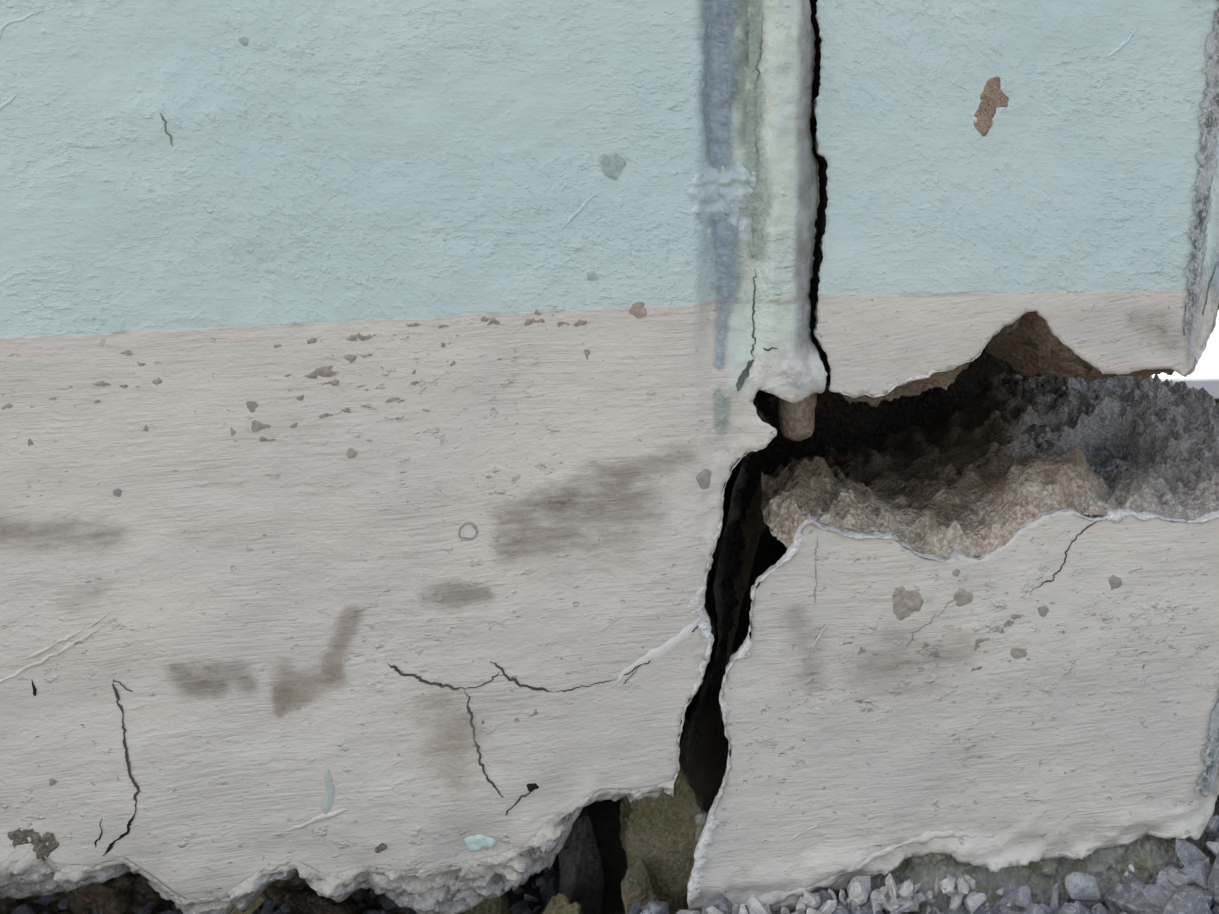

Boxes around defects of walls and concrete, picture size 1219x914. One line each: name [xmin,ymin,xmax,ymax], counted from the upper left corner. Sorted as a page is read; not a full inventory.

damp [700,0,770,369]
crack [809,0,831,386]
peeling [973,76,1009,137]
crack [736,217,778,420]
spalling [826,253,1219,407]
spalling [802,519,973,607]
crack [1031,521,1097,592]
spalling [1075,509,1219,524]
crack [94,679,140,856]
spalling [0,777,677,914]
crack [387,660,650,816]
crack [673,450,825,904]